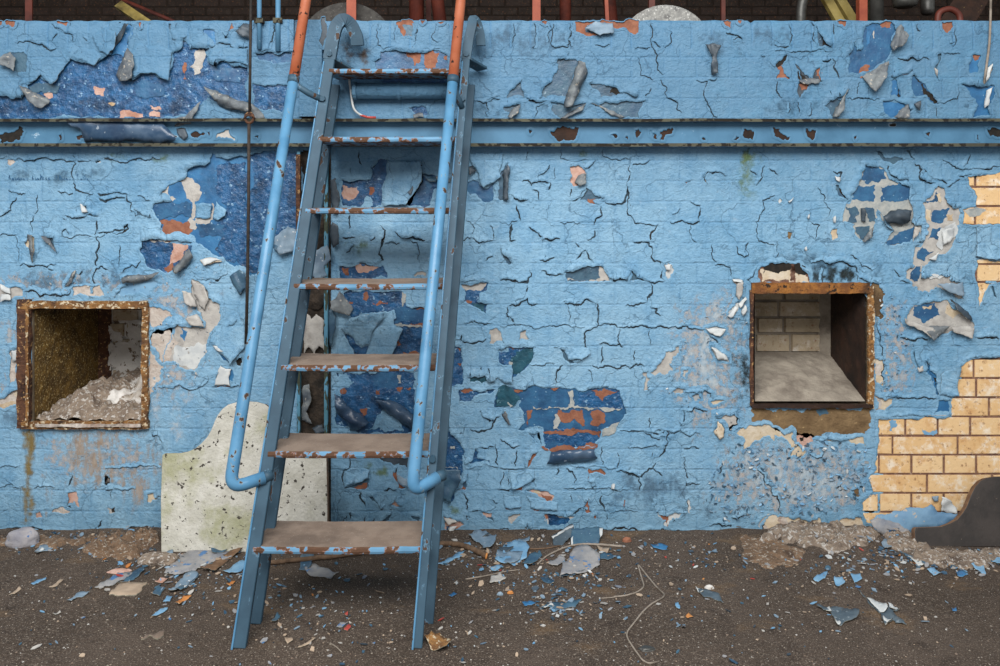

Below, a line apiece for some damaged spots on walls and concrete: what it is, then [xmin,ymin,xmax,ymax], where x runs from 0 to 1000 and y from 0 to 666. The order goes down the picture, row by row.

corrosion [23,430,34,475]
crack [0,151,160,298]
crack [0,431,165,530]
peeling [0,19,314,398]
peeling [301,371,417,434]
peeling [303,154,452,354]
peeling [438,273,632,584]
crack [456,149,779,386]
crack [464,384,785,531]
flaking render [639,147,1000,535]
crack [811,169,910,285]
crack [877,321,938,417]